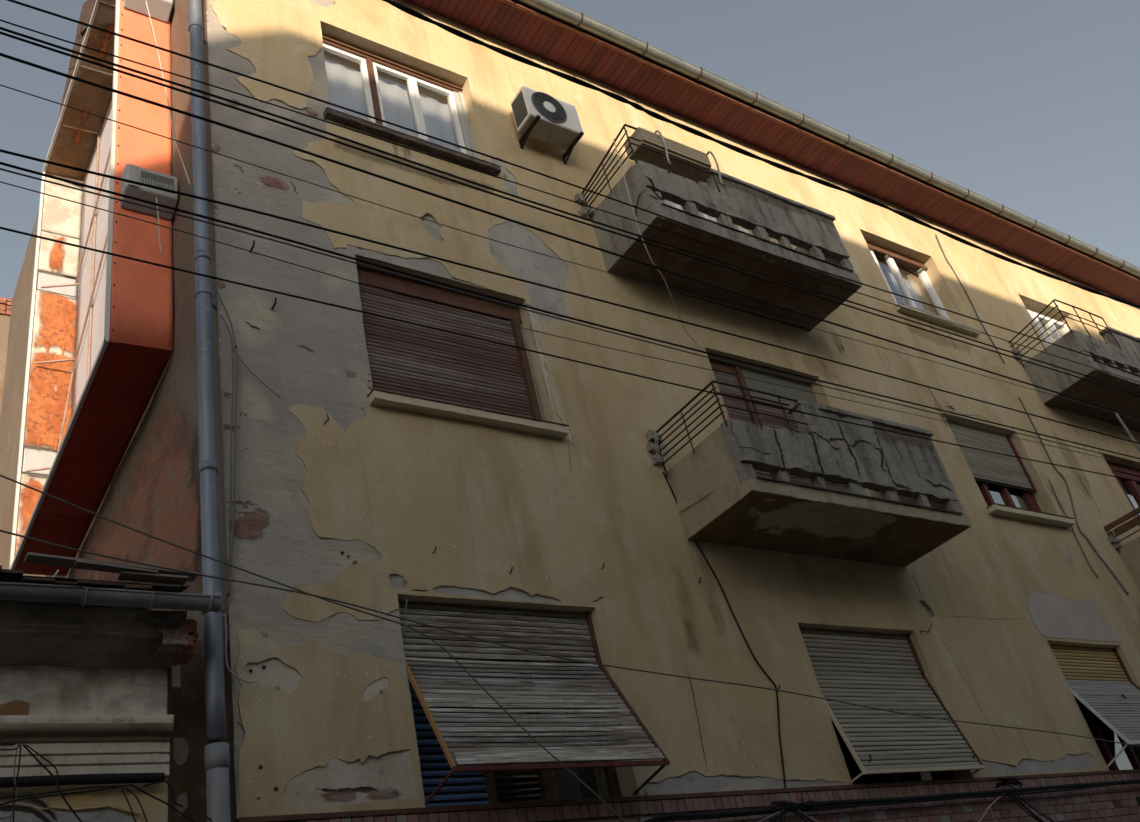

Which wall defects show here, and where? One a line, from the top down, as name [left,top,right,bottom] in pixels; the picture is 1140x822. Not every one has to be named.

peeling [491,159,517,196]
peeling [206,0,491,806]
peeling [433,586,560,603]
spalling [168,619,199,666]
peeling [0,700,29,715]
peeling [982,753,1097,776]
peeling [642,771,843,795]